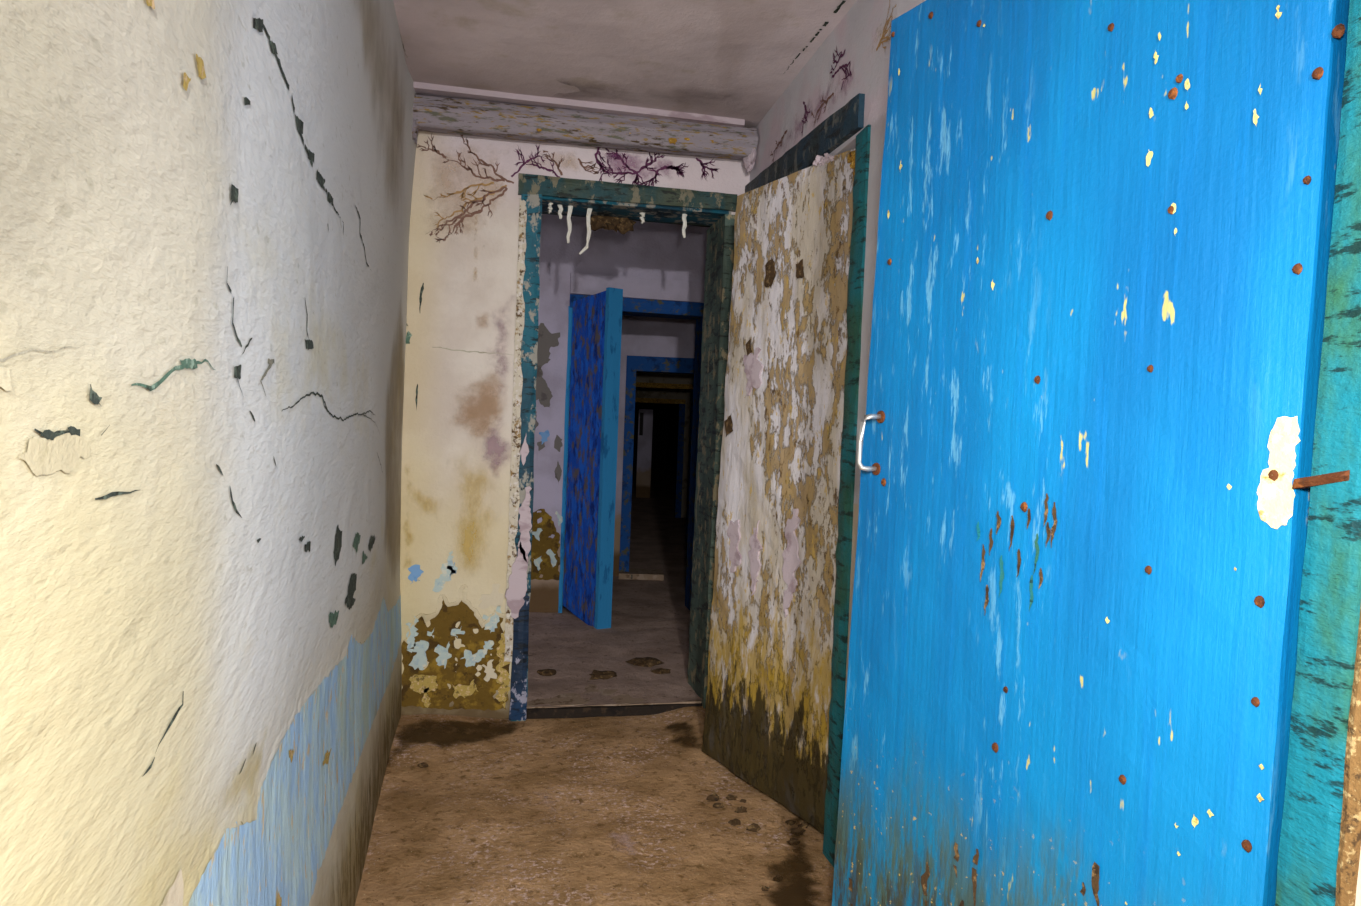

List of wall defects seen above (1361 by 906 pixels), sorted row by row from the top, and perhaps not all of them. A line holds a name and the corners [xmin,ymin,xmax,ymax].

leakage [417,134,718,243]
leakage [467,387,505,467]
peeling [782,509,802,617]
peeling [161,486,563,906]